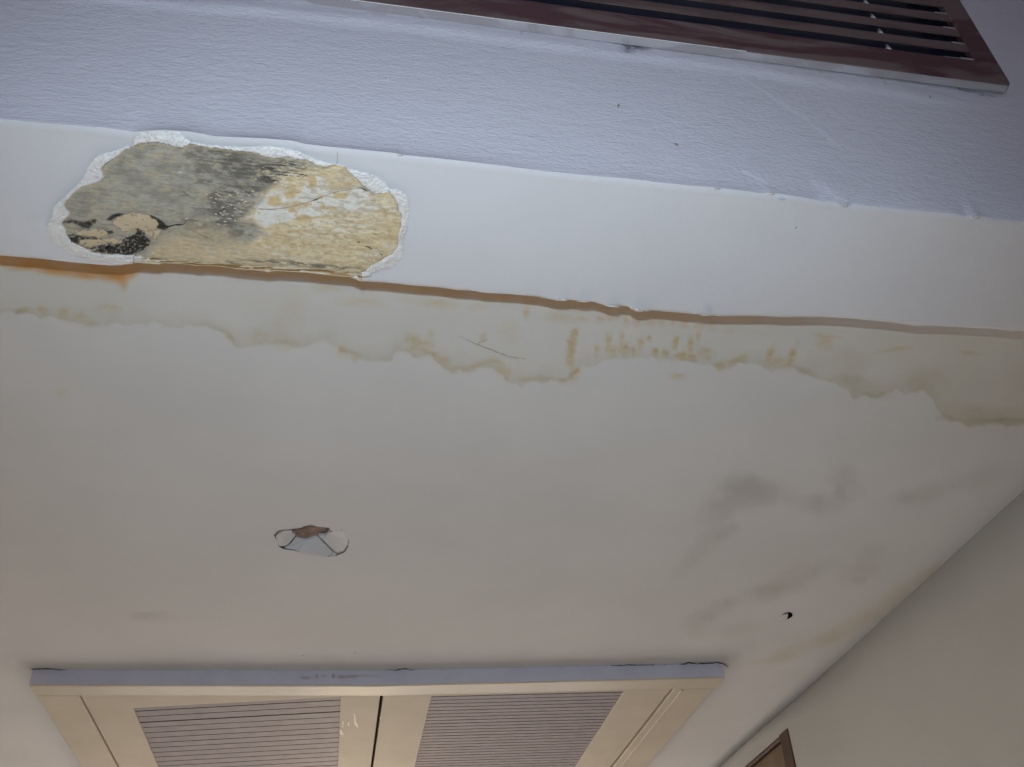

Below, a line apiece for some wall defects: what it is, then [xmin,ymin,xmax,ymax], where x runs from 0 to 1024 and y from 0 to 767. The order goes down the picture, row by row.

flaking render [47,130,409,282]